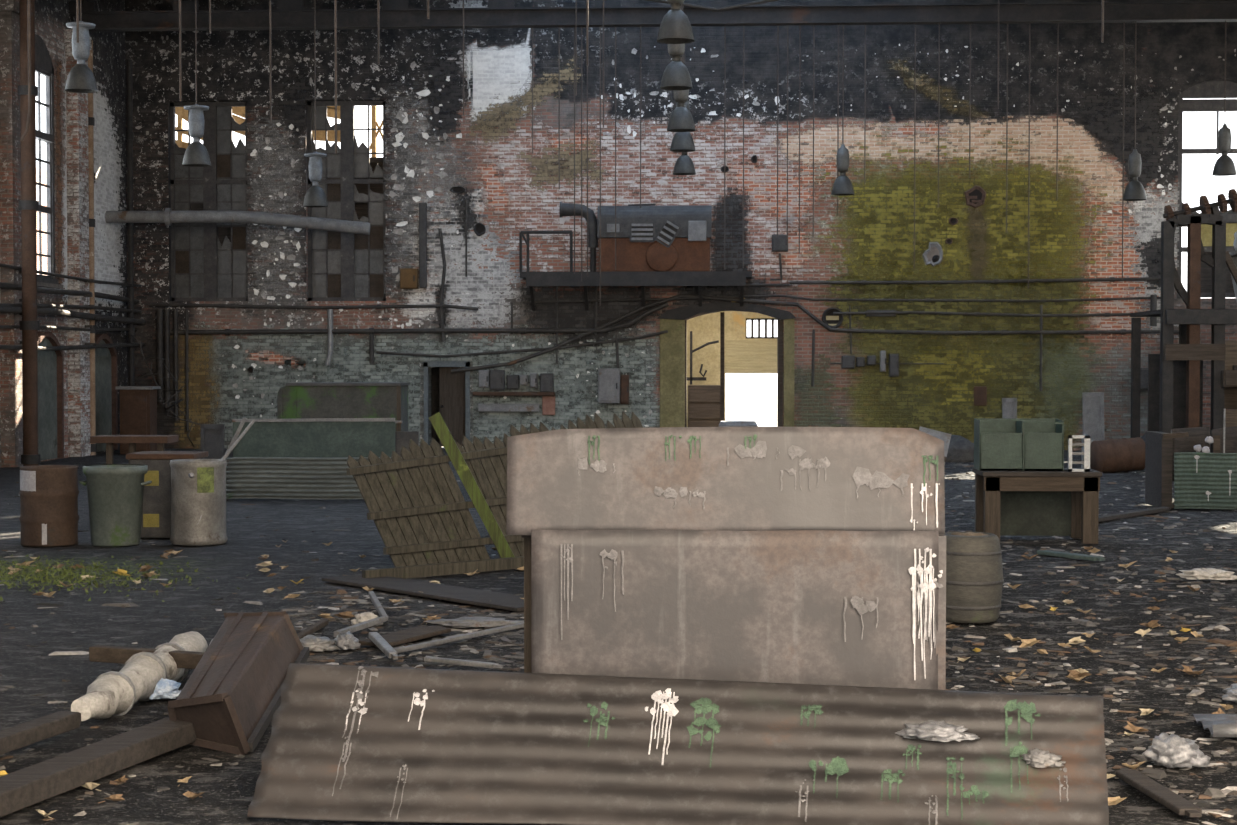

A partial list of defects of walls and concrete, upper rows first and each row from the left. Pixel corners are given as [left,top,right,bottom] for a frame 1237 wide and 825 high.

peeling [448,0,488,8]
peeling [273,39,331,85]
peeling [54,41,68,320]
peeling [93,65,164,326]
peeling [250,123,299,177]
spalling [351,45,1173,349]
peeling [252,224,431,329]